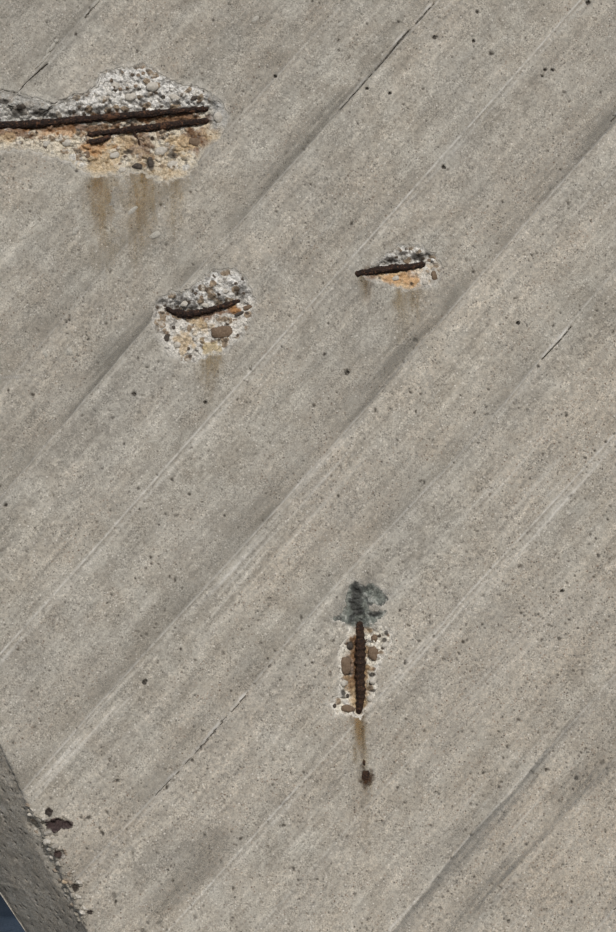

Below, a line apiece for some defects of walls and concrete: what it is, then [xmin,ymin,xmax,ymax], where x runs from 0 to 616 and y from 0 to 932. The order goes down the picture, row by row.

crack [342,3,435,107]
spalling [0,63,230,184]
spalling [151,268,256,364]
spalling [355,245,442,292]
spalling [330,581,392,720]
crack [155,697,244,796]
rust [362,759,374,784]
spalling [25,803,93,927]